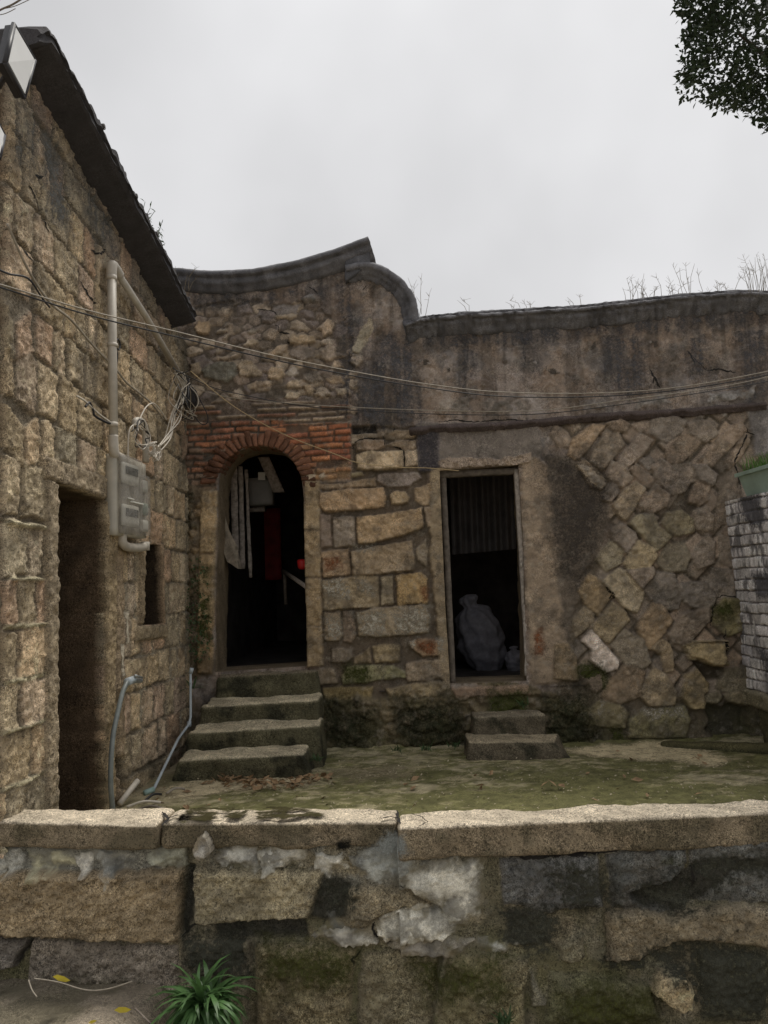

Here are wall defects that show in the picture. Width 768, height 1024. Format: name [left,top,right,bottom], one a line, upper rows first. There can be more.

crack [688,351,735,373]